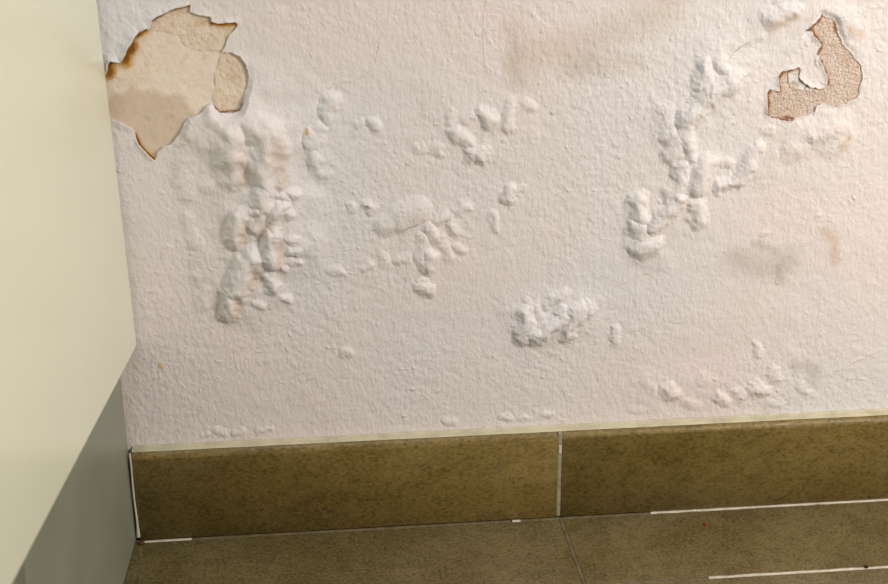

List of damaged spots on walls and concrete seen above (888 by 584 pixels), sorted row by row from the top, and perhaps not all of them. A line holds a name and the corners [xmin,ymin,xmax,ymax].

peeling [103,0,255,166]
peeling [762,13,871,128]